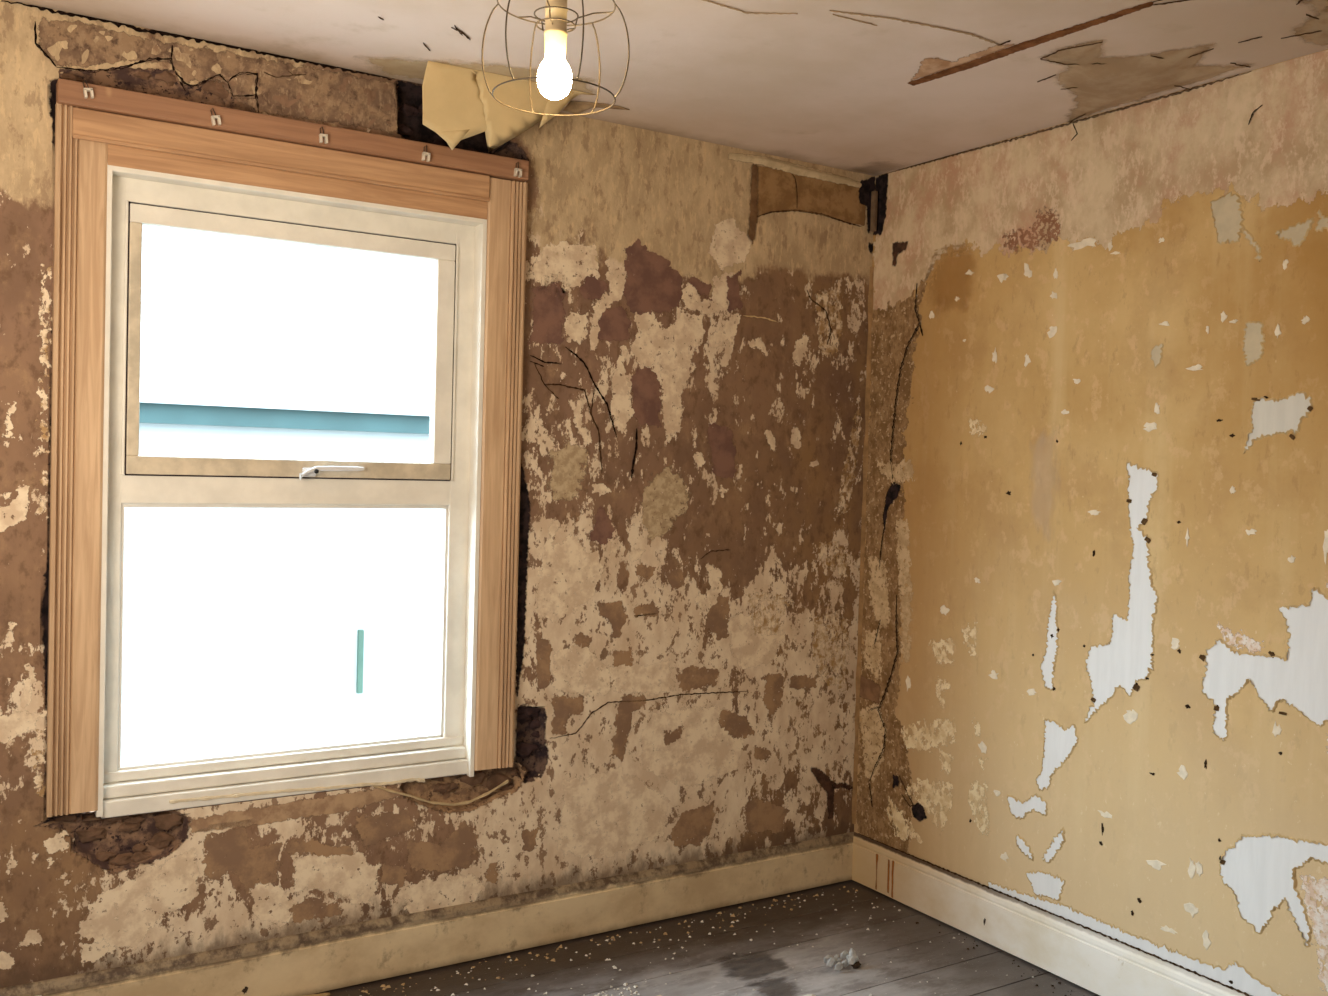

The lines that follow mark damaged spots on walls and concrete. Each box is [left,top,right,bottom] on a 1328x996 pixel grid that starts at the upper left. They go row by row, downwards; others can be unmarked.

crack [5,1,395,112]
spalling [396,80,529,161]
peeling [35,261,53,455]
peeling [530,241,627,351]
peeling [610,218,768,468]
peeling [792,288,843,366]
crack [890,285,923,480]
peeling [0,470,49,532]
crack [869,595,913,807]
peeling [6,704,549,964]
peeling [555,705,745,859]
peeling [0,929,44,970]